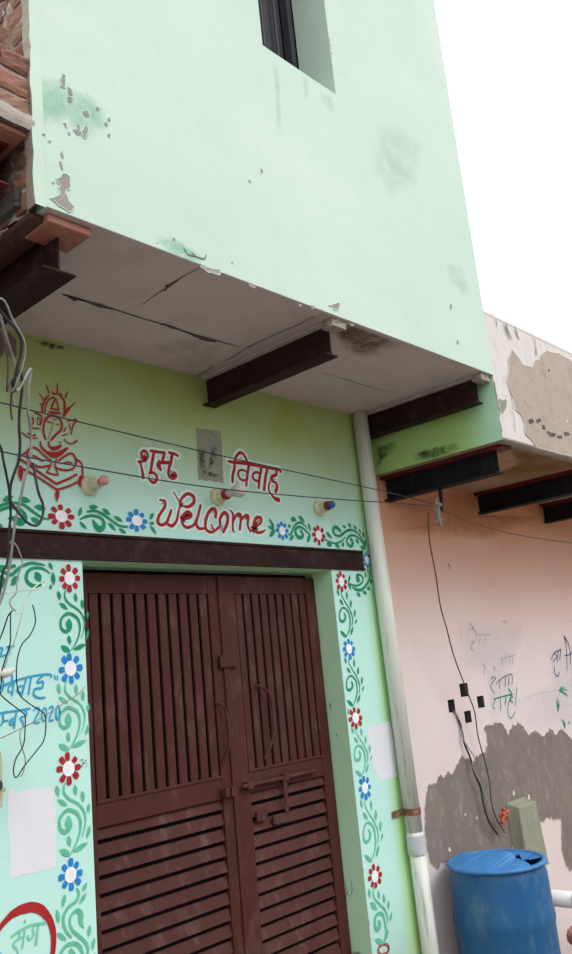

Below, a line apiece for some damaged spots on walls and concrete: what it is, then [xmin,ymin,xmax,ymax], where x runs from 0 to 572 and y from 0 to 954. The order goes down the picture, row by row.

peeling [60,73,73,103]
peeling [64,107,99,139]
peeling [50,151,74,213]
crack [114,247,314,377]
peeling [498,349,572,457]
peeling [424,721,572,872]